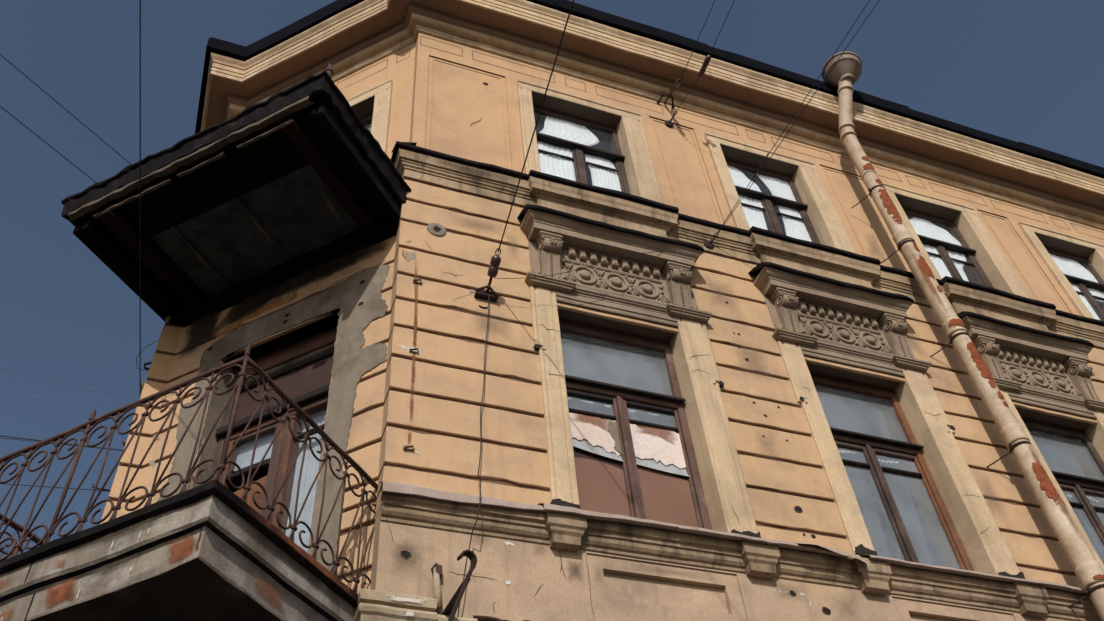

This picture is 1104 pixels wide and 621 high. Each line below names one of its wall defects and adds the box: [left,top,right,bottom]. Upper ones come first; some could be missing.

rust [862,156,903,223]
rust [912,242,942,296]
rust [948,318,1008,406]